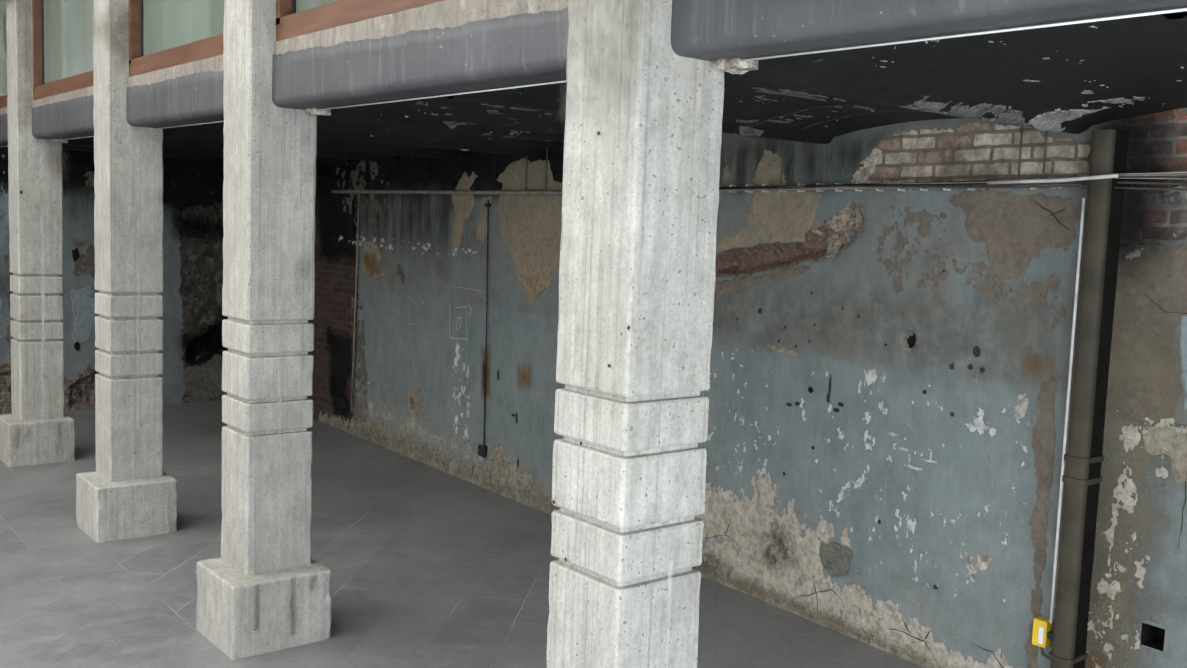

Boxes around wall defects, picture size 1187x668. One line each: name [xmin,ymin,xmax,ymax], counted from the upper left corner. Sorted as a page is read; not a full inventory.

peeling [714,115,865,299]
flaking render [851,80,1145,329]
flaking render [692,369,1058,668]
flaking render [1086,103,1187,668]